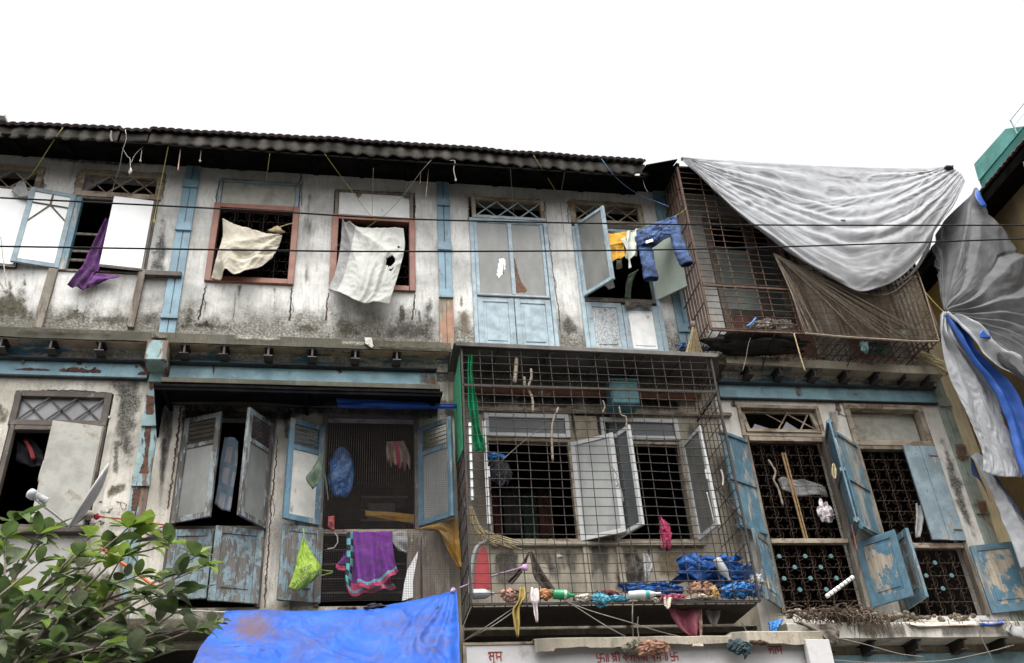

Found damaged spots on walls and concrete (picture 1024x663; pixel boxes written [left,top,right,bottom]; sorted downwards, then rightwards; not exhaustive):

crack [197,285,207,320]
leakage [377,303,433,337]
peeling [15,360,101,373]
leakage [113,381,140,471]
crack [167,406,182,508]
leakage [108,484,125,496]
peeling [131,487,143,511]
leakage [945,453,970,525]
crack [264,439,278,607]